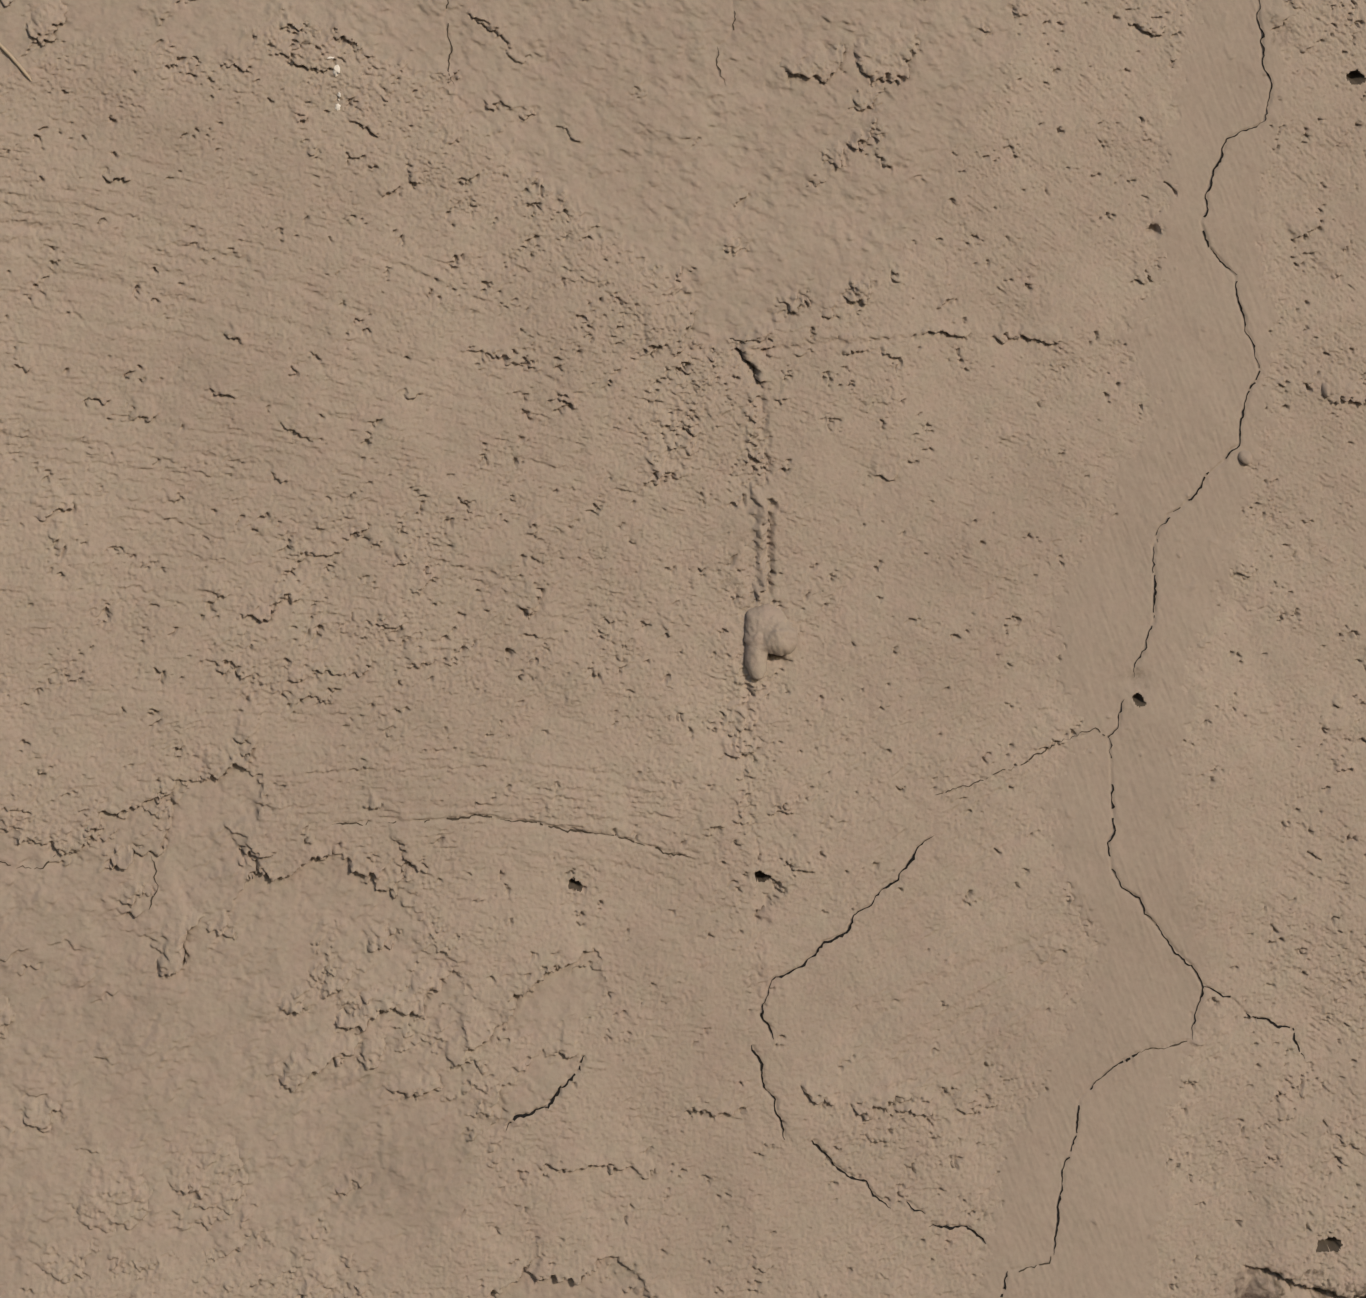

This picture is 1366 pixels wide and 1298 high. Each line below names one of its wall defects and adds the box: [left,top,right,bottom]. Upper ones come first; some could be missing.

crack [716,11,736,85]
crack [936,0,1305,1297]
spalling [0,763,607,1298]
crack [751,836,986,1244]